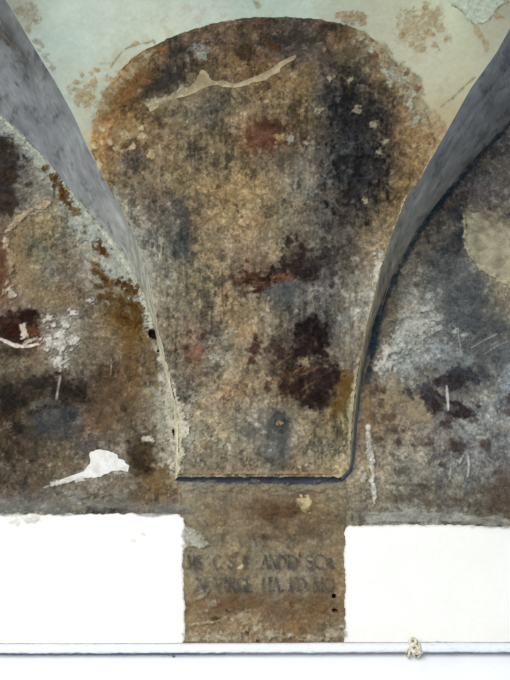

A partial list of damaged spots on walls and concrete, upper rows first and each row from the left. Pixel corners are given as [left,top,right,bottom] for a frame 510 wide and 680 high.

flaking render [145,56,296,112]
damp [314,66,393,226]
corrosion [89,238,149,383]
damp [0,308,126,438]
damp [246,313,354,421]
damp [397,365,490,428]
flaking render [50,449,129,486]